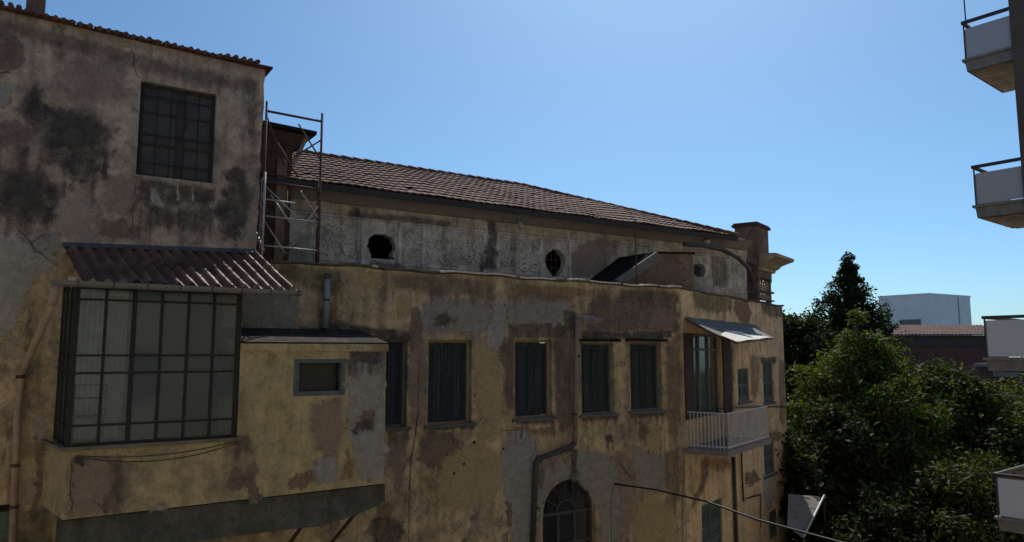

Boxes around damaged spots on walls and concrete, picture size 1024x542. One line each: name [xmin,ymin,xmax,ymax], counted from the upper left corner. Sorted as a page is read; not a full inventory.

leakage [0,87,118,227]
leakage [139,167,252,249]
leakage [371,221,499,302]
peeling [342,351,390,483]
crack [403,362,425,533]
peeling [500,429,622,542]